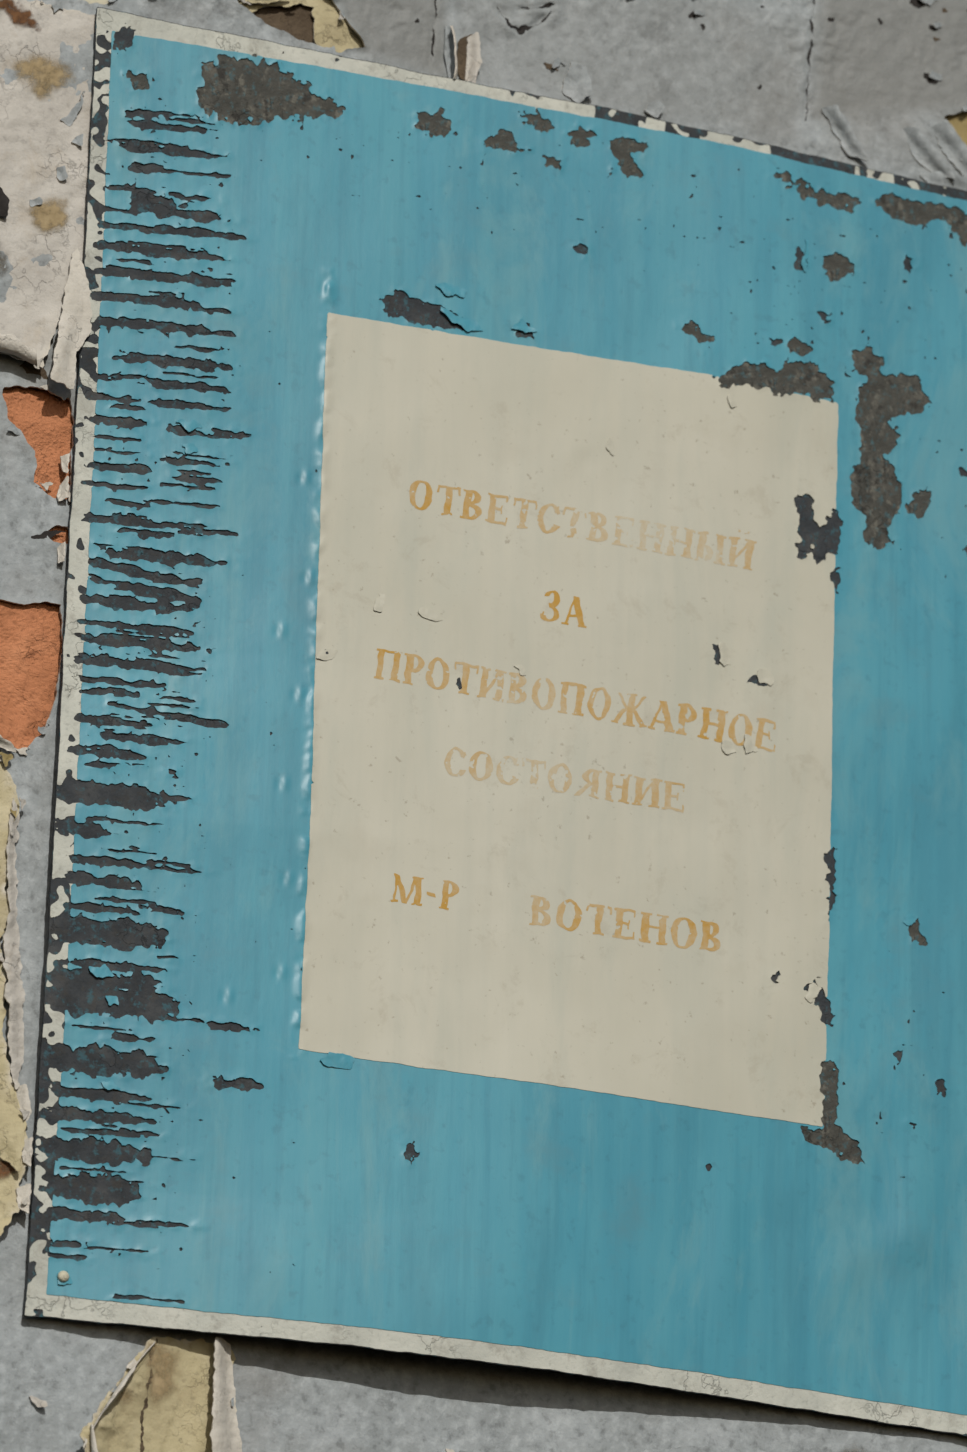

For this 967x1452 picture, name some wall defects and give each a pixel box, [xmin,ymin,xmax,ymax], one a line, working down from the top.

peeling [238,0,364,53]
peeling [688,10,705,30]
peeling [910,0,948,41]
peeling [924,70,943,84]
peeling [821,105,870,161]
peeling [903,106,967,191]
peeling [0,0,116,502]
spalling [31,526,69,564]
peeling [0,600,62,1236]
peeling [80,1337,242,1452]